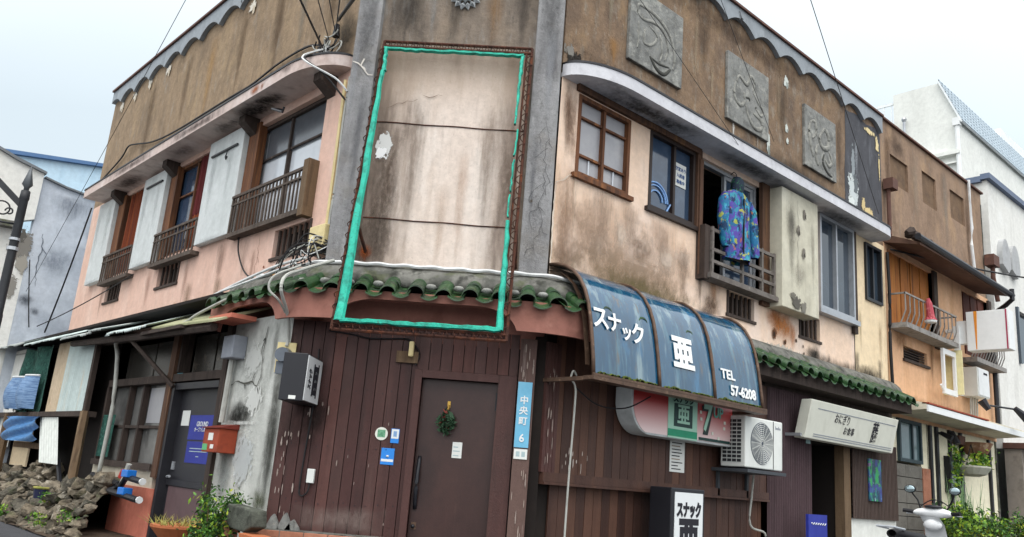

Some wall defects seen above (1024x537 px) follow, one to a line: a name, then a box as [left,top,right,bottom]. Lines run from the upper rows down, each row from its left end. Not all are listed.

peeling [375,131,393,160]
damp [376,151,395,217]
crack [524,115,572,273]
flaking render [844,110,882,221]
spalling [7,229,33,299]
crack [232,329,268,392]
damp [231,404,248,424]
damp [264,384,279,477]